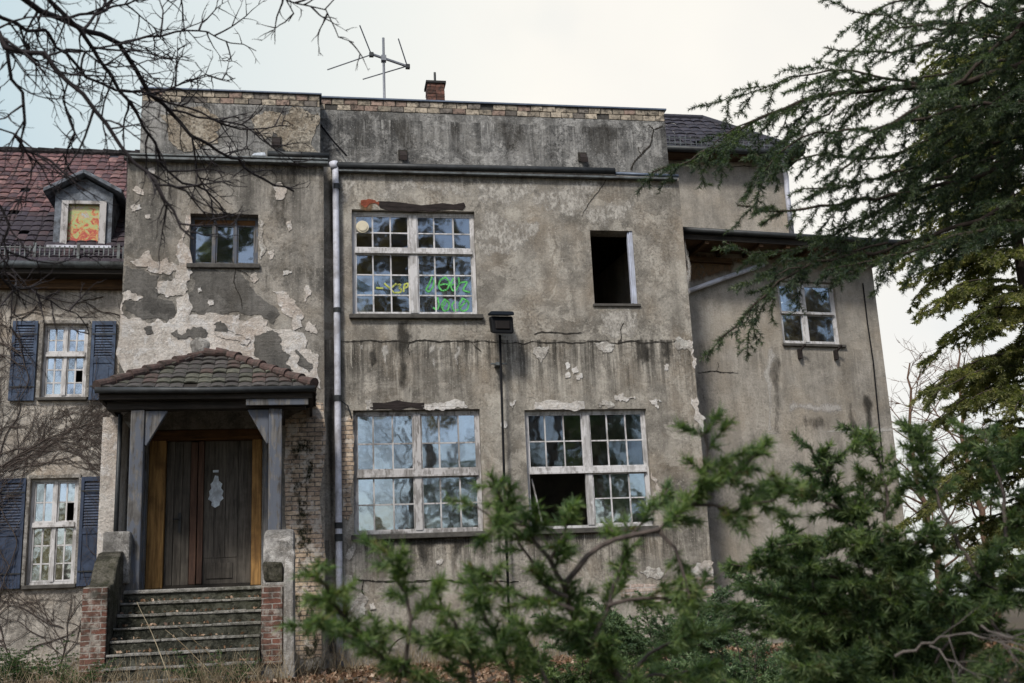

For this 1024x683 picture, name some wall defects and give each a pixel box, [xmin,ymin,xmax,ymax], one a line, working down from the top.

flaking render [158,105,224,152]
flaking render [251,107,320,152]
crack [630,125,662,170]
flaking render [273,182,287,200]
corrosion [360,199,379,210]
flaking render [116,215,321,389]
water stain [370,322,410,386]
crack [340,323,734,373]
flaking render [565,362,583,380]
water stain [639,340,649,361]
flaking render [691,397,706,432]